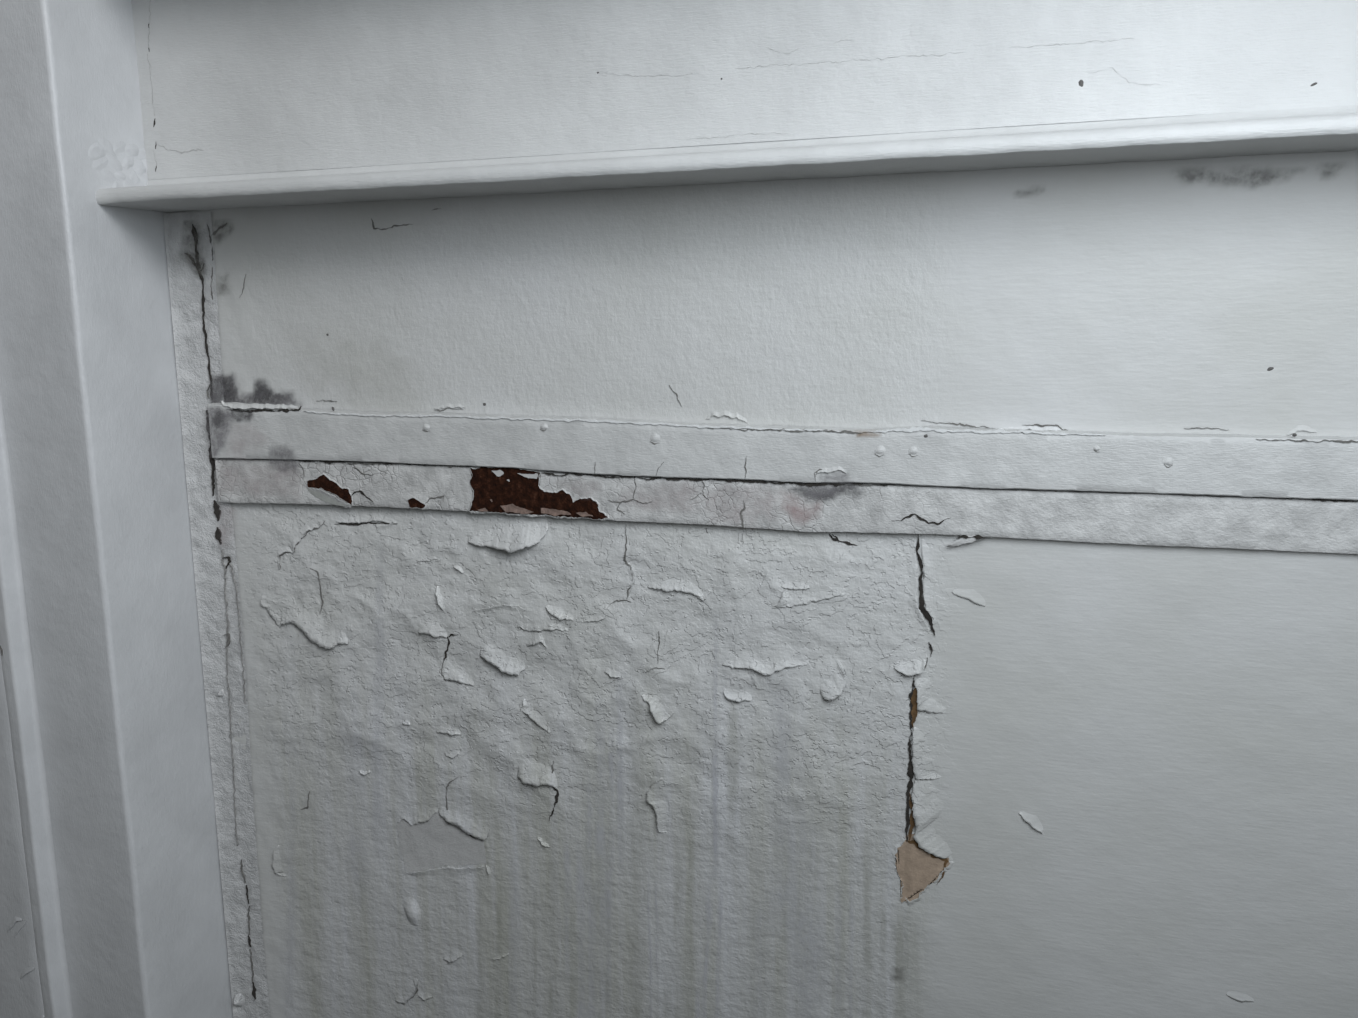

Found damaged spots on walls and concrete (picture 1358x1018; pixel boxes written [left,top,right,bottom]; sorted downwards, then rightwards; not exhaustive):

rust [306,473,373,508]
rust [468,467,610,521]
peeling [277,513,397,570]
peeling [468,520,548,553]
crack [185,223,256,999]
peeling [260,568,349,649]
peeling [472,604,606,676]
peeling [722,657,808,702]
crack [891,514,949,842]
peeling [894,659,946,713]
peeling [397,777,491,877]
peeling [892,727,954,907]